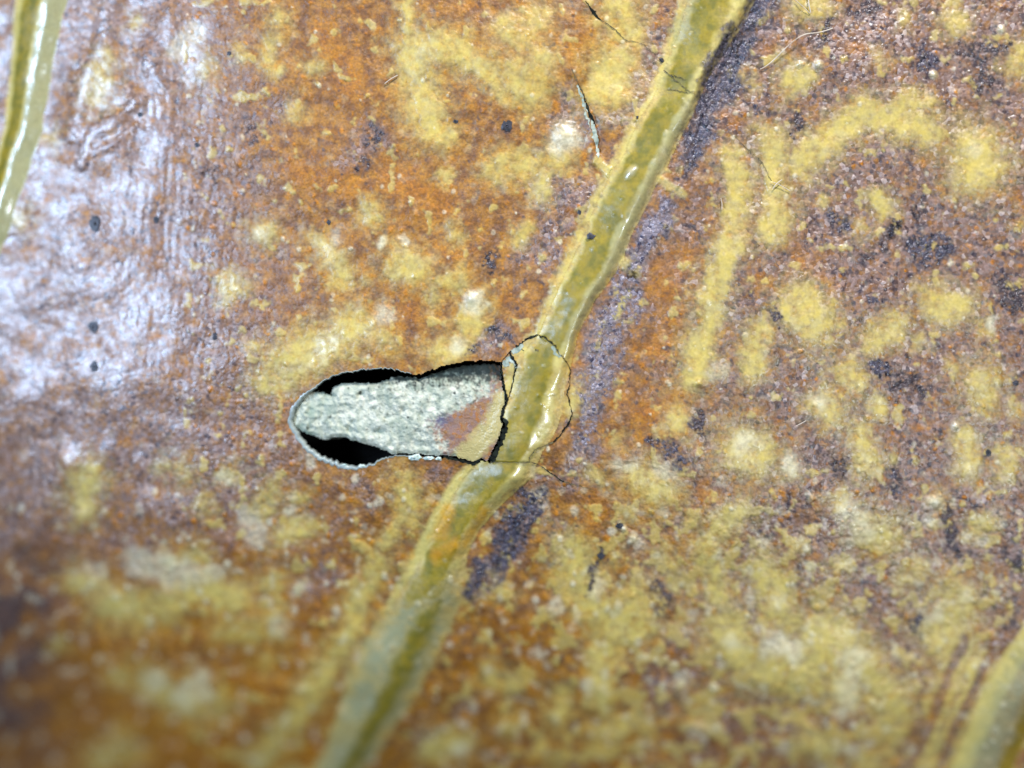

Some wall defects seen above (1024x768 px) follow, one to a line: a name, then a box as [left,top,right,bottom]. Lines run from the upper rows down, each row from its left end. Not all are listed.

spalling [287,336,572,470]
crack [443,334,595,491]